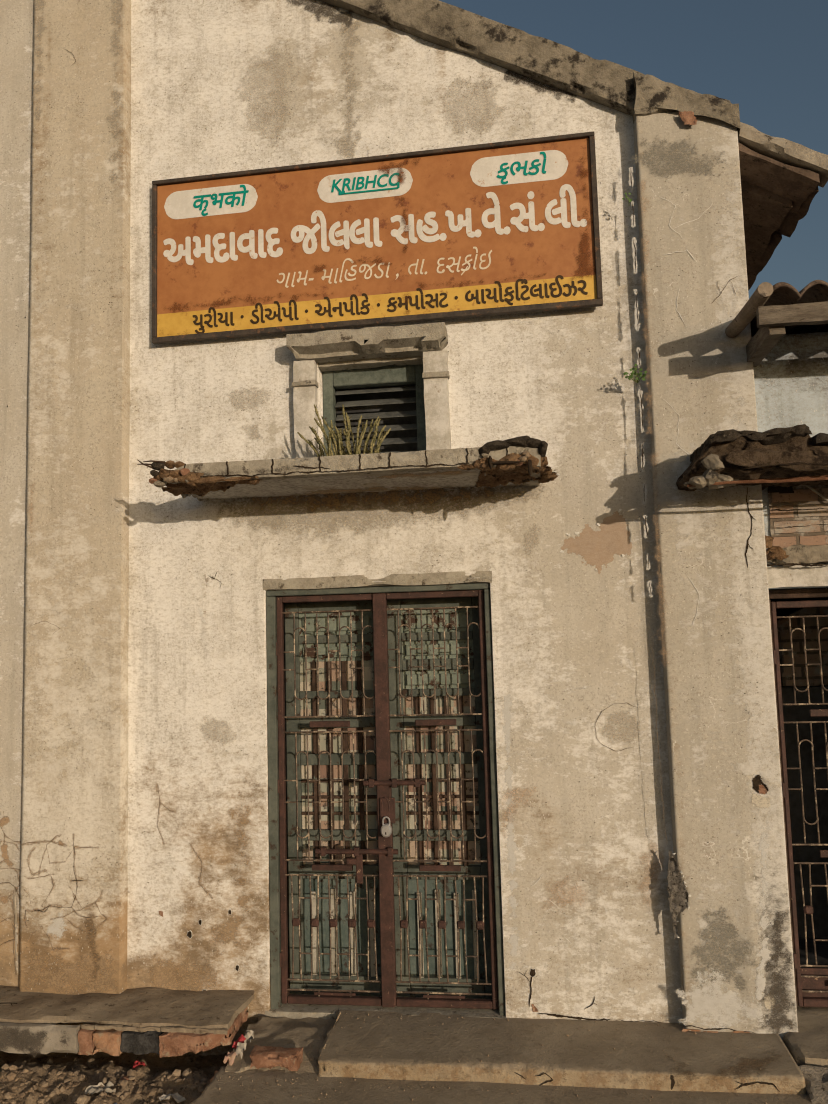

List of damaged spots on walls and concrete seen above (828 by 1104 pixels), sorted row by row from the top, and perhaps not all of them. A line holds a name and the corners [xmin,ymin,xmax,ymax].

water stain [288,0,359,93]
water stain [504,70,577,103]
spalling [137,459,269,497]
spalling [457,435,559,488]
flaking render [684,448,828,561]
crack [0,814,107,974]
water stain [213,877,247,955]
spalling [667,850,691,939]
water stain [675,821,795,1034]
crack [519,970,657,1022]
crack [683,1025,754,1033]
crack [736,1082,780,1092]